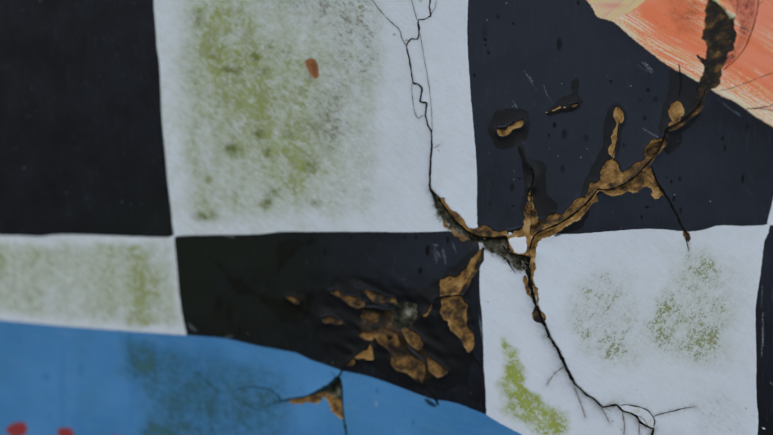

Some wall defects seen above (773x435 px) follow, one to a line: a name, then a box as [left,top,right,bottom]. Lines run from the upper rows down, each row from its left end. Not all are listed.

crack [197,340,371,435]
peeling [289,377,343,419]
peeling [330,0,737,382]
crack [372,0,771,435]